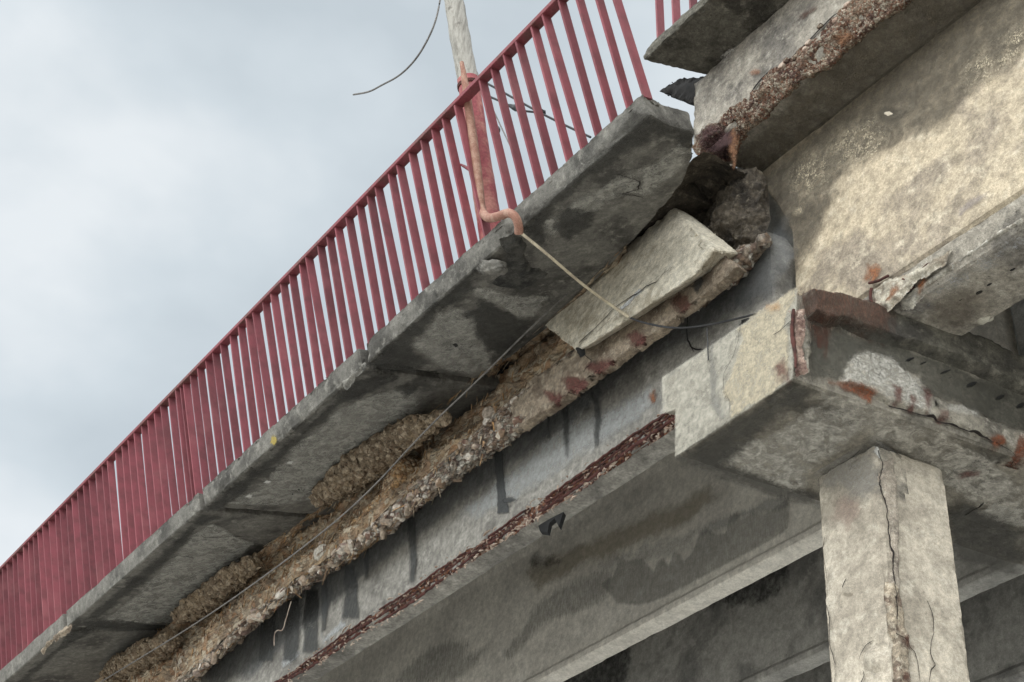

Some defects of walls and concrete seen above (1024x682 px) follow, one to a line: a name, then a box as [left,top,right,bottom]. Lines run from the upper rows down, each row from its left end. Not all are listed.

spalling [692,0,912,250]
spalling [868,218,1023,312]
spalling [342,362,367,390]
damp [208,0,1024,682]
rust [800,287,898,341]
rust [840,381,876,403]
crack [888,405,1016,463]
rust [274,391,677,682]
crack [878,450,936,680]